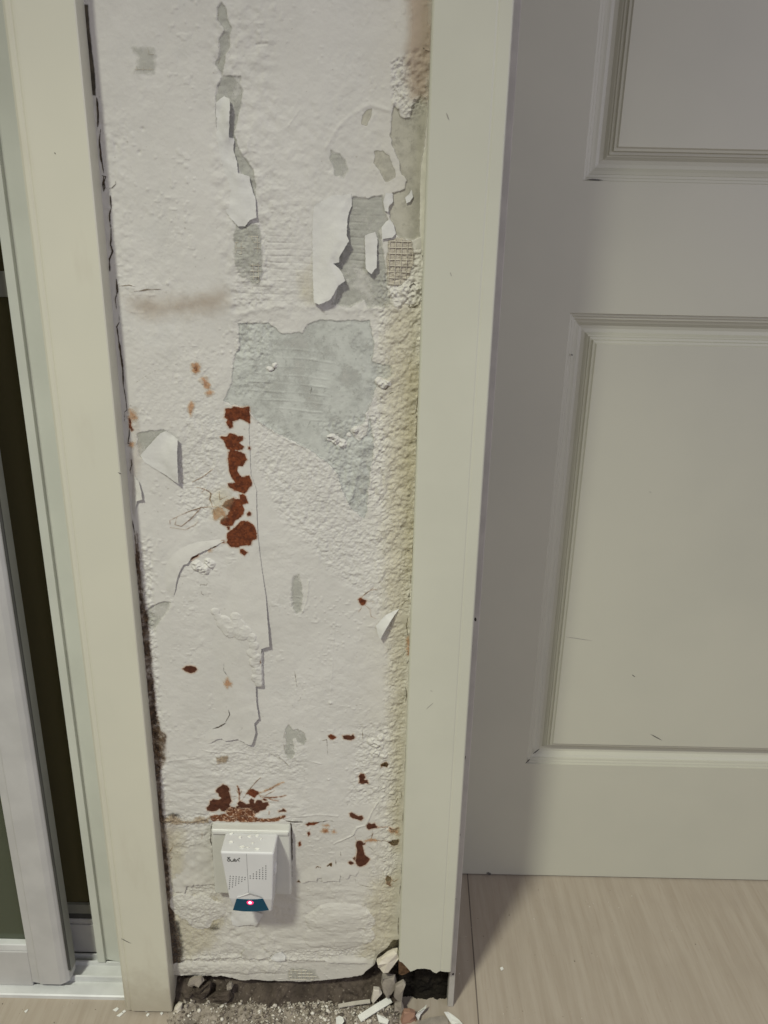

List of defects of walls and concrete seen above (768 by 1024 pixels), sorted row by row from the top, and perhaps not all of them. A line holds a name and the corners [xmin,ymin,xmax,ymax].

peeling [215,4,257,226]
spalling [312,96,428,307]
crack [96,98,138,473]
peeling [137,430,179,484]
rust [190,406,257,560]
spalling [206,319,392,745]
rust [206,778,286,822]
rust [348,812,399,867]
spalling [174,939,399,1009]
spalling [416,1005,449,1024]